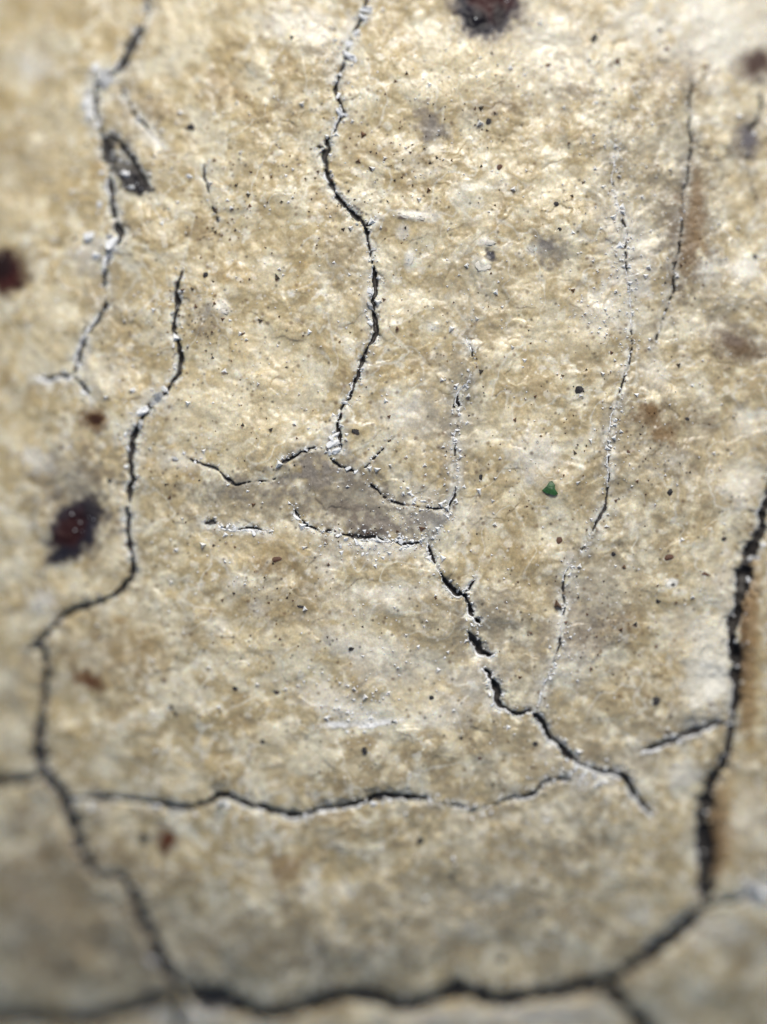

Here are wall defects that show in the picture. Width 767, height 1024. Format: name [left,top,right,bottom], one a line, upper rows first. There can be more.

crack [321,137,336,192]
crack [333,193,377,257]
crack [340,266,379,410]
crack [126,339,184,503]
crack [436,569,481,627]
crack [467,632,495,659]
crack [481,668,533,717]
crack [0,507,256,1024]
crack [71,791,428,821]
crack [530,712,652,817]
crack [611,485,767,1024]
crack [176,905,704,1024]